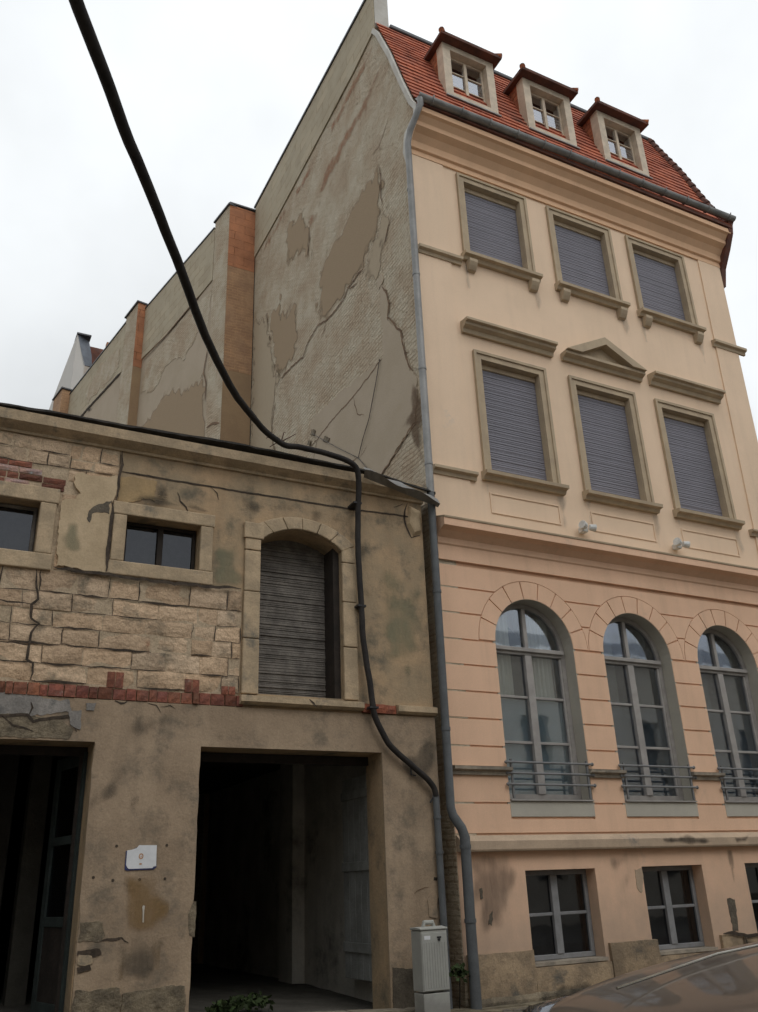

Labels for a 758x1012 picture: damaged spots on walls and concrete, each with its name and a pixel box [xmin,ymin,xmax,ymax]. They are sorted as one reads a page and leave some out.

crack [374,119,392,246]
crack [281,269,363,378]
crack [382,287,413,371]
crack [304,359,381,455]
crack [381,427,411,474]
peeling [0,457,118,576]
crack [0,451,420,732]
peeling [0,692,96,739]